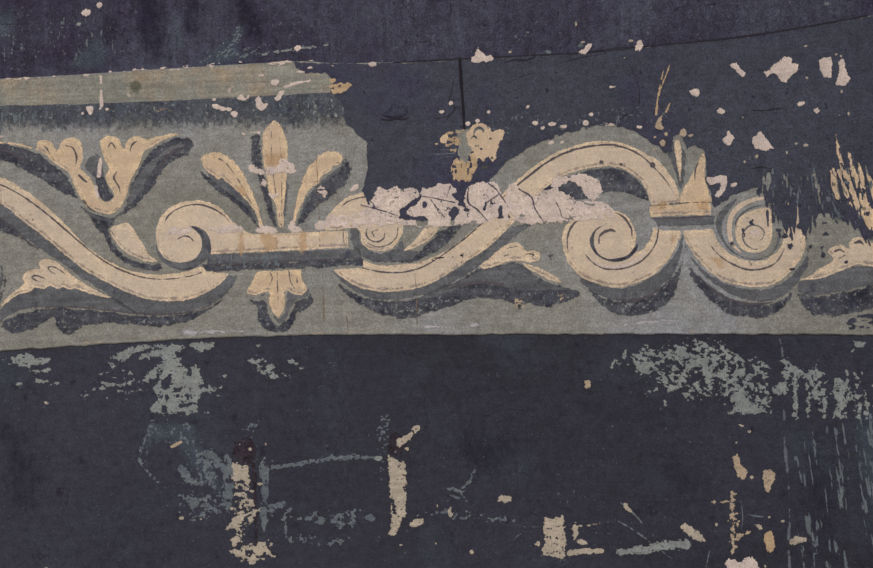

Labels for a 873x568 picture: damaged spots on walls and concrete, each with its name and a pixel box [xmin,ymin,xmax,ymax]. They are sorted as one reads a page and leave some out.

crack [393,0,868,129]
peeling [763,56,798,83]
peeling [819,53,850,93]
peeling [314,173,614,230]
peeling [744,132,774,163]
peeling [764,138,873,230]
peeling [81,336,227,416]
peeling [610,331,873,568]
peeling [220,420,375,565]
peeling [535,515,604,559]